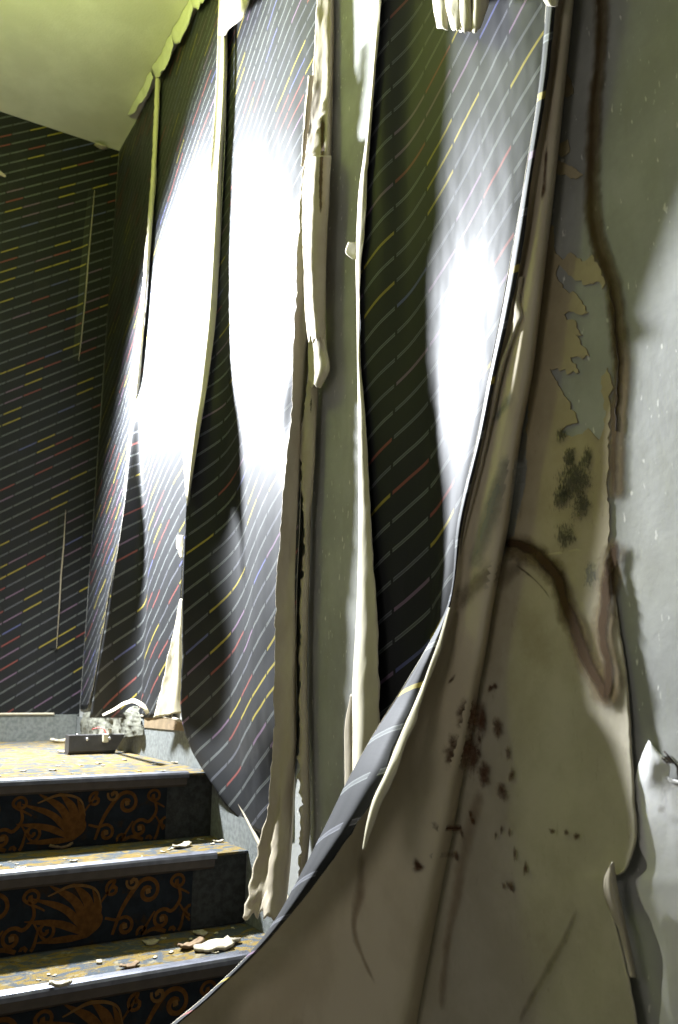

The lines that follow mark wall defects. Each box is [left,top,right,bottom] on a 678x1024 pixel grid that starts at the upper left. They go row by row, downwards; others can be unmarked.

peeling [127,0,204,116]
peeling [301,75,314,166]
water stain [554,428,591,547]
water stain [505,539,621,703]